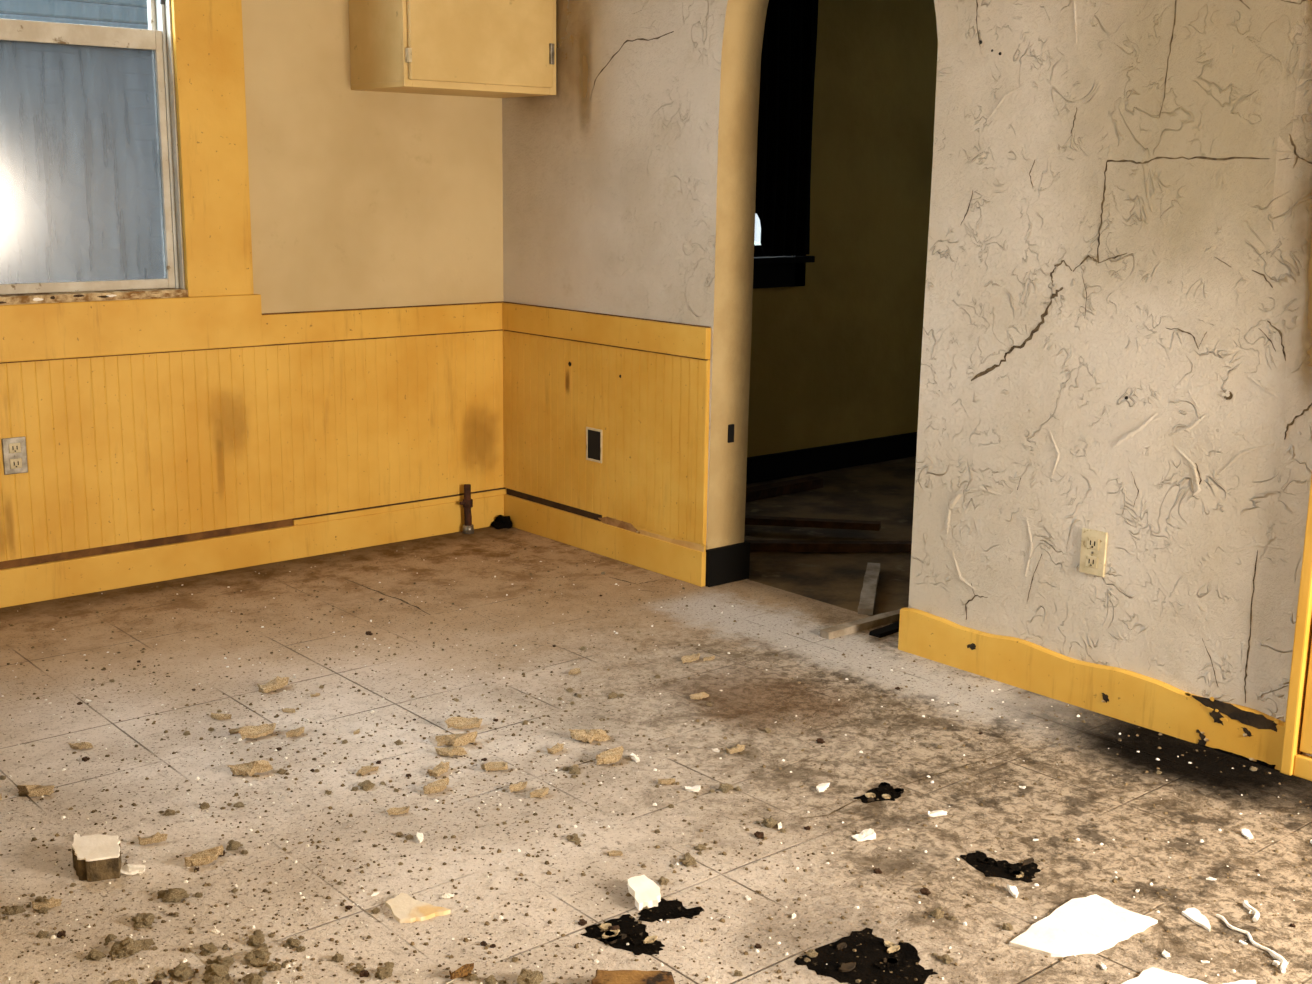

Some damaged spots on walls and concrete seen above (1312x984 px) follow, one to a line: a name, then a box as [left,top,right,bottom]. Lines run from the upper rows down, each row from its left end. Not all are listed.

crack [590,31,674,100]
crack [1159,0,1176,118]
crack [971,134,1312,381]
peeling [1184,692,1279,769]
peeling [979,857,1034,878]
peeling [599,923,657,946]
peeling [837,943,856,972]
peeling [883,941,900,967]